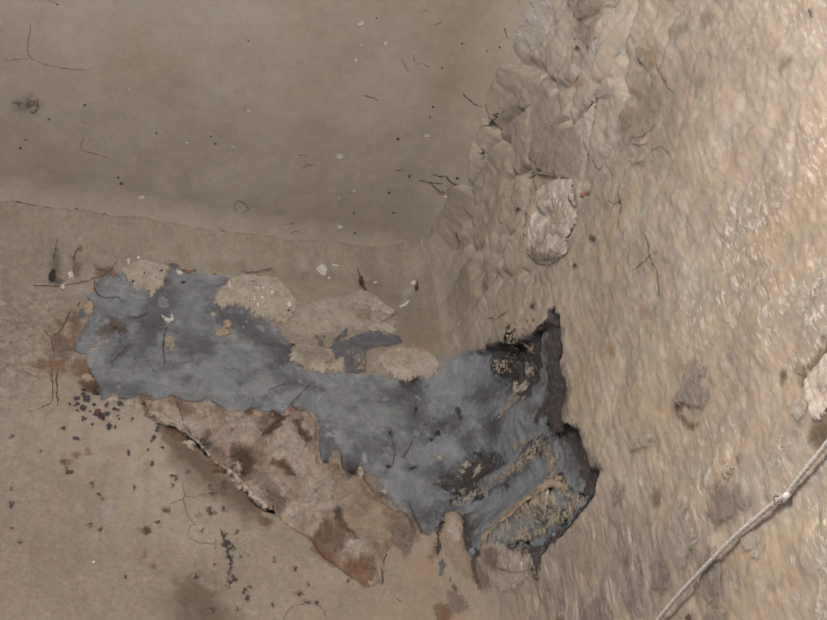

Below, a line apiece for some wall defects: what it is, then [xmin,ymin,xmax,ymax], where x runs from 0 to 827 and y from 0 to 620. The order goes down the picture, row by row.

flaking render [68,263,602,594]